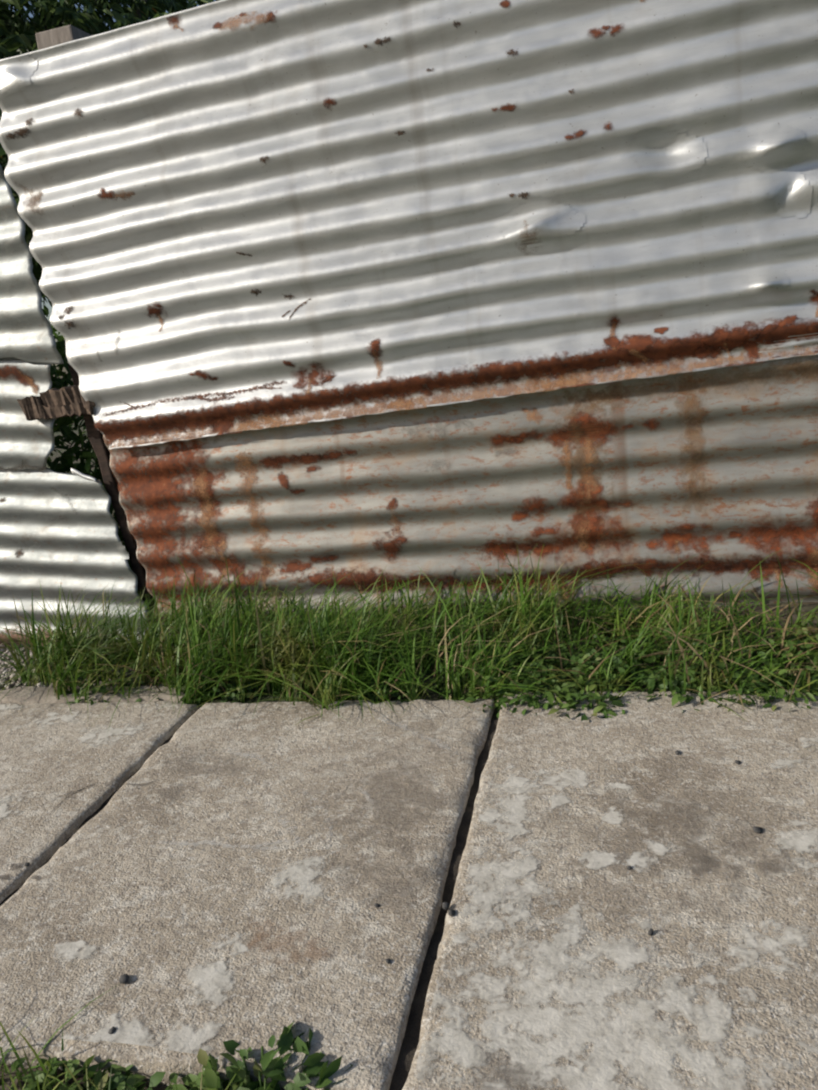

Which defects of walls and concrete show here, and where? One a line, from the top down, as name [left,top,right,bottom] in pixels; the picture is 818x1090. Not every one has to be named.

corrosion [212,12,275,29]
corrosion [589,25,622,38]
corrosion [98,188,134,199]
corrosion [0,365,39,394]
corrosion [94,290,818,624]